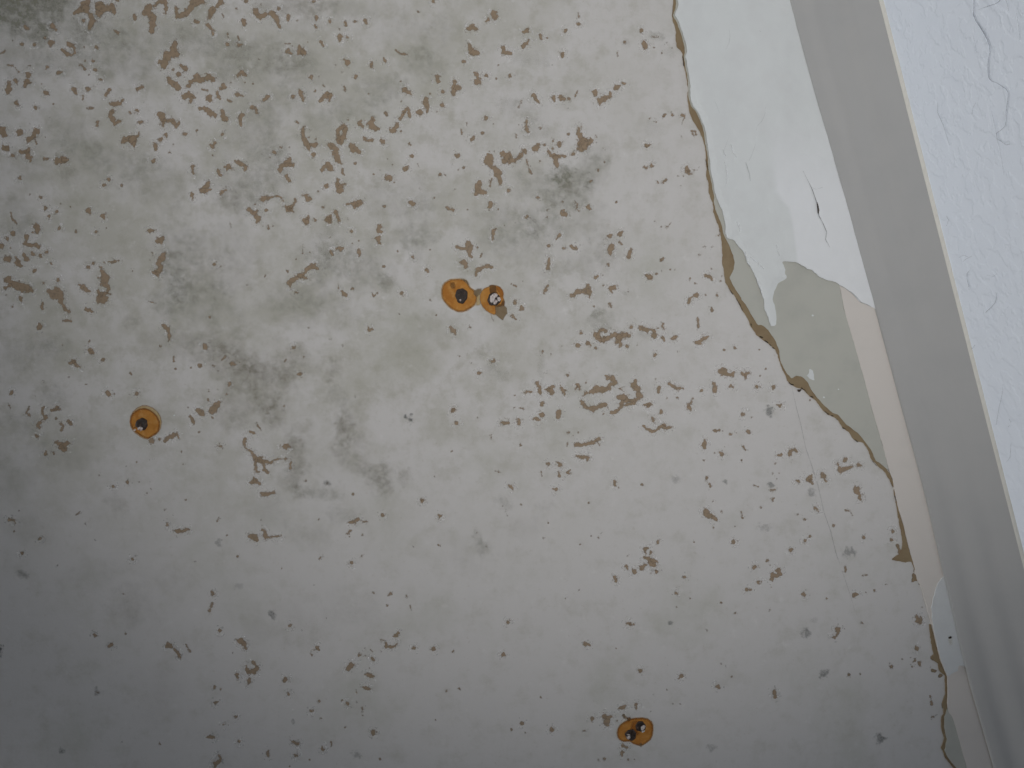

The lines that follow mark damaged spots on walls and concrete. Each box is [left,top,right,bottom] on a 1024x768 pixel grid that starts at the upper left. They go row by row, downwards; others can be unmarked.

corrosion [441,279,507,320]
peeling [684,268,718,347]
corrosion [130,406,161,439]
peeling [792,457,865,516]
peeling [745,559,782,591]
corrosion [617,714,653,746]